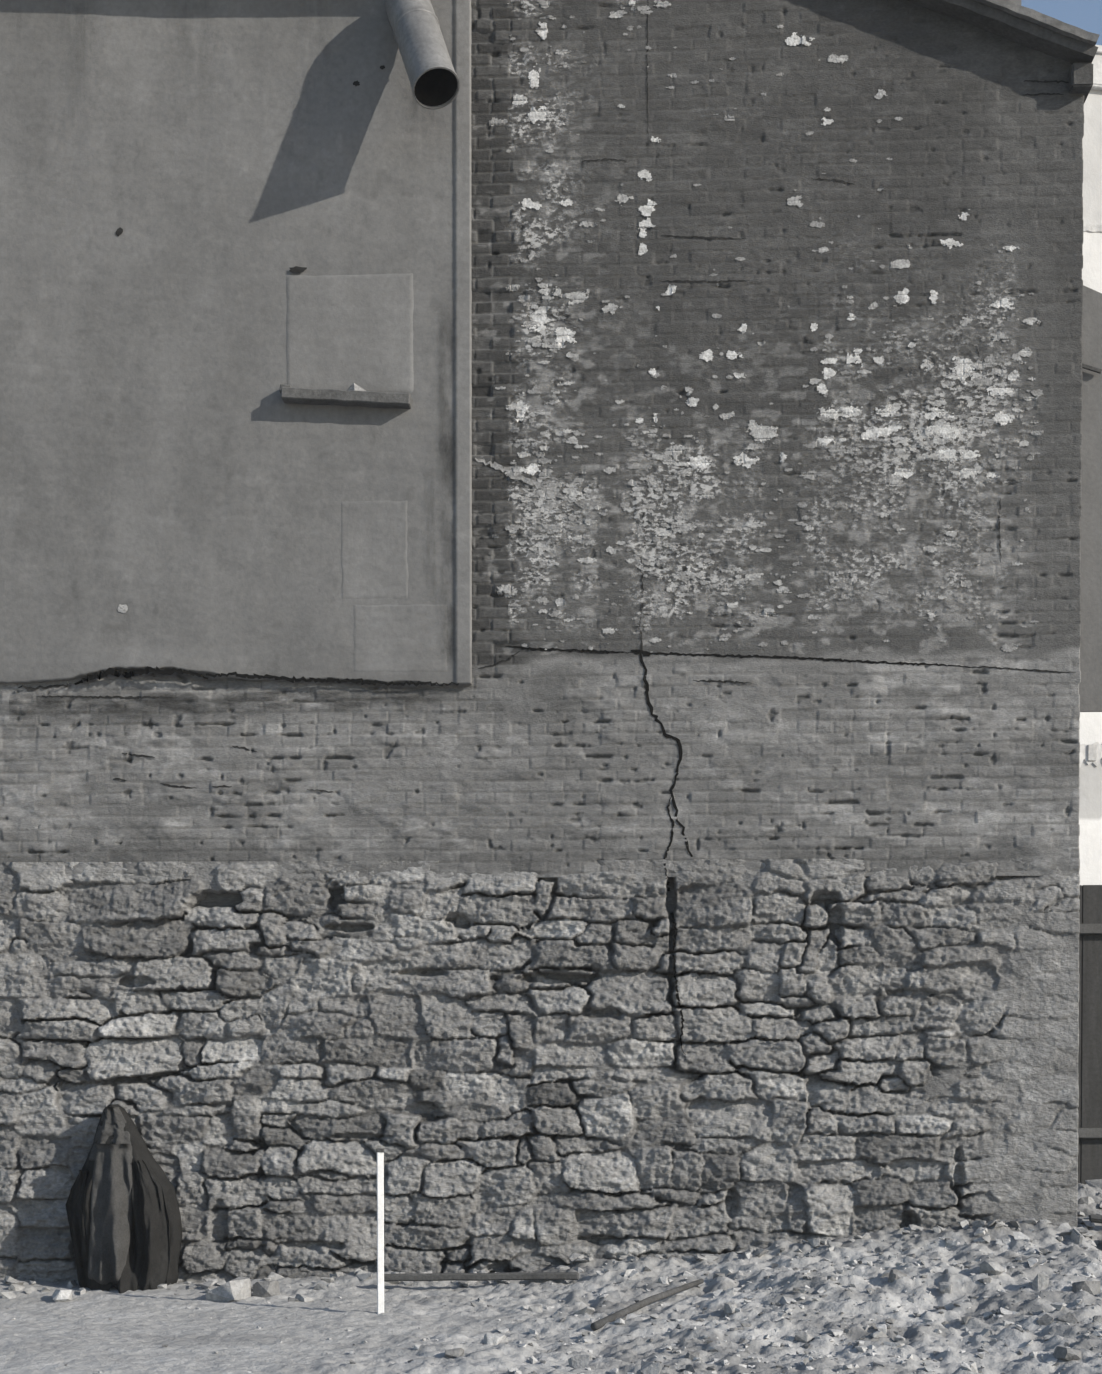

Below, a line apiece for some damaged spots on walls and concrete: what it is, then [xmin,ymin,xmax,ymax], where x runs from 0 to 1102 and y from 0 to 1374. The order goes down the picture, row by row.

crack [18,512,1076,1060]
peeling [489,0,1044,653]
crack [996,499,1004,562]